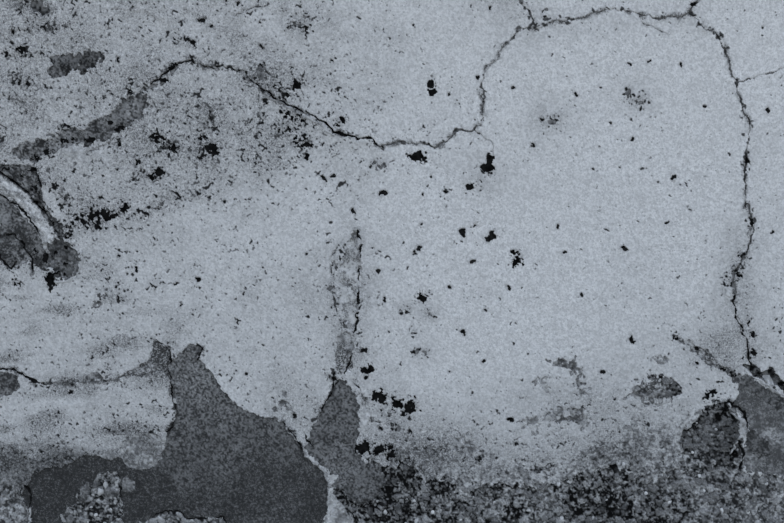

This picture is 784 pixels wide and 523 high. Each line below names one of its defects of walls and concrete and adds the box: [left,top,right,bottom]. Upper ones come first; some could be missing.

crack [150,58,240,84]
crack [256,78,486,149]
crack [503,0,590,48]
crack [615,2,697,33]
peeling [0,65,179,284]
crack [709,30,784,396]
hole [327,229,363,333]
peeling [0,335,784,523]